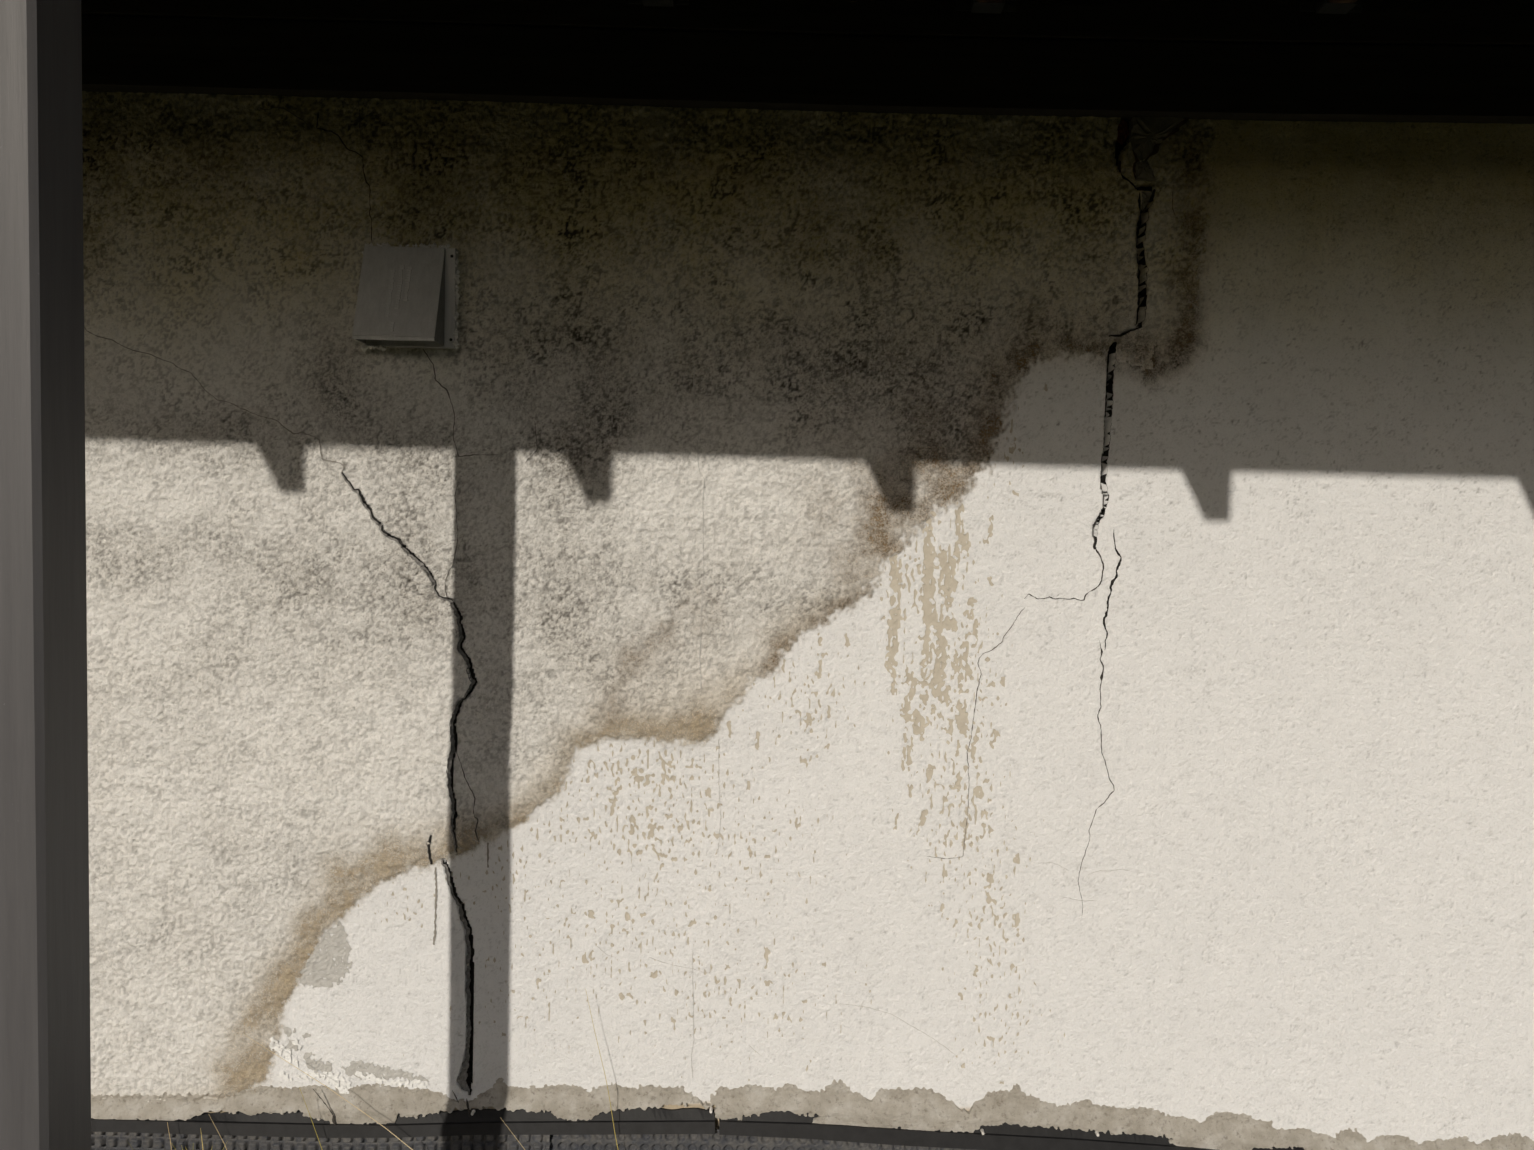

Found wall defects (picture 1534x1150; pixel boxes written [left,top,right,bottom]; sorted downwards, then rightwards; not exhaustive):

crack [84,326,538,1115]
crack [313,1089,336,1125]
water stain [222,826,489,1092]
peeling [445,633,865,1081]
peeling [879,407,1051,1084]
water stain [860,336,1101,556]
crack [927,189,1156,913]